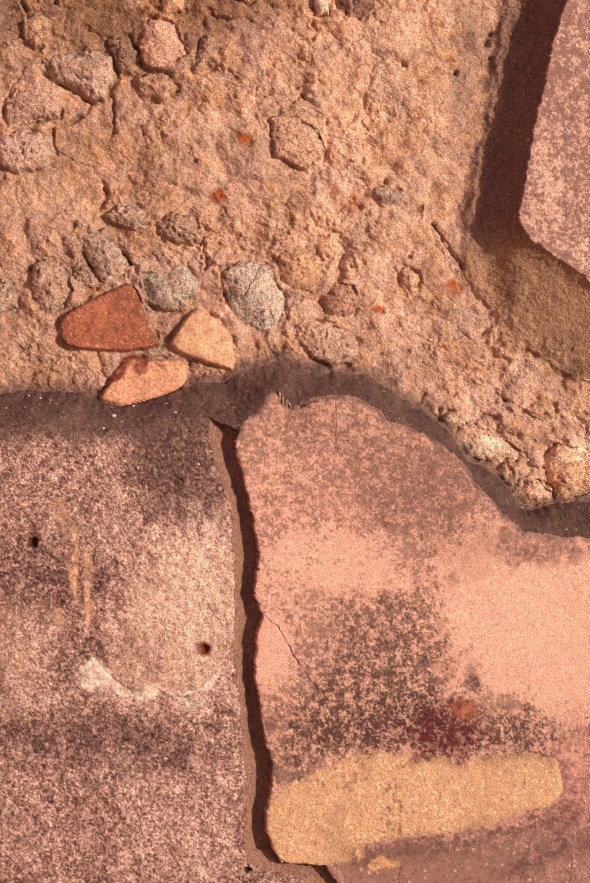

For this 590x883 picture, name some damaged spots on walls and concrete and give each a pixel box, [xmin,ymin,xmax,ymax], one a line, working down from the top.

spalling [0,0,590,539]